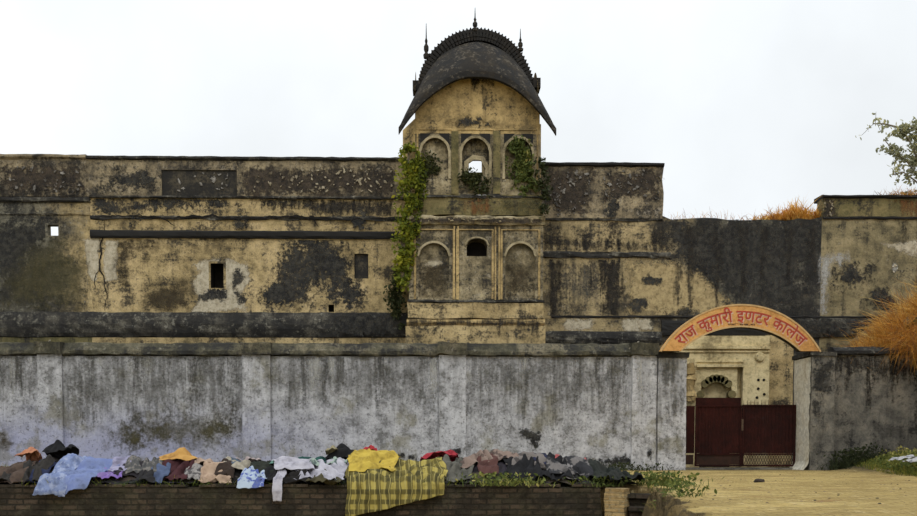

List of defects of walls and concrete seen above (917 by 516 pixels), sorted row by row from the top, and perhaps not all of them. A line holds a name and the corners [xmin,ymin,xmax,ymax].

water stain [0,167,252,230]
water stain [261,199,394,230]
water stain [0,216,62,292]
water stain [143,285,187,311]
crack [85,214,382,311]
water stain [256,240,399,336]
water stain [419,256,448,296]
water stain [543,196,897,337]
water stain [409,318,539,337]
water stain [519,428,541,448]
water stain [599,454,630,467]